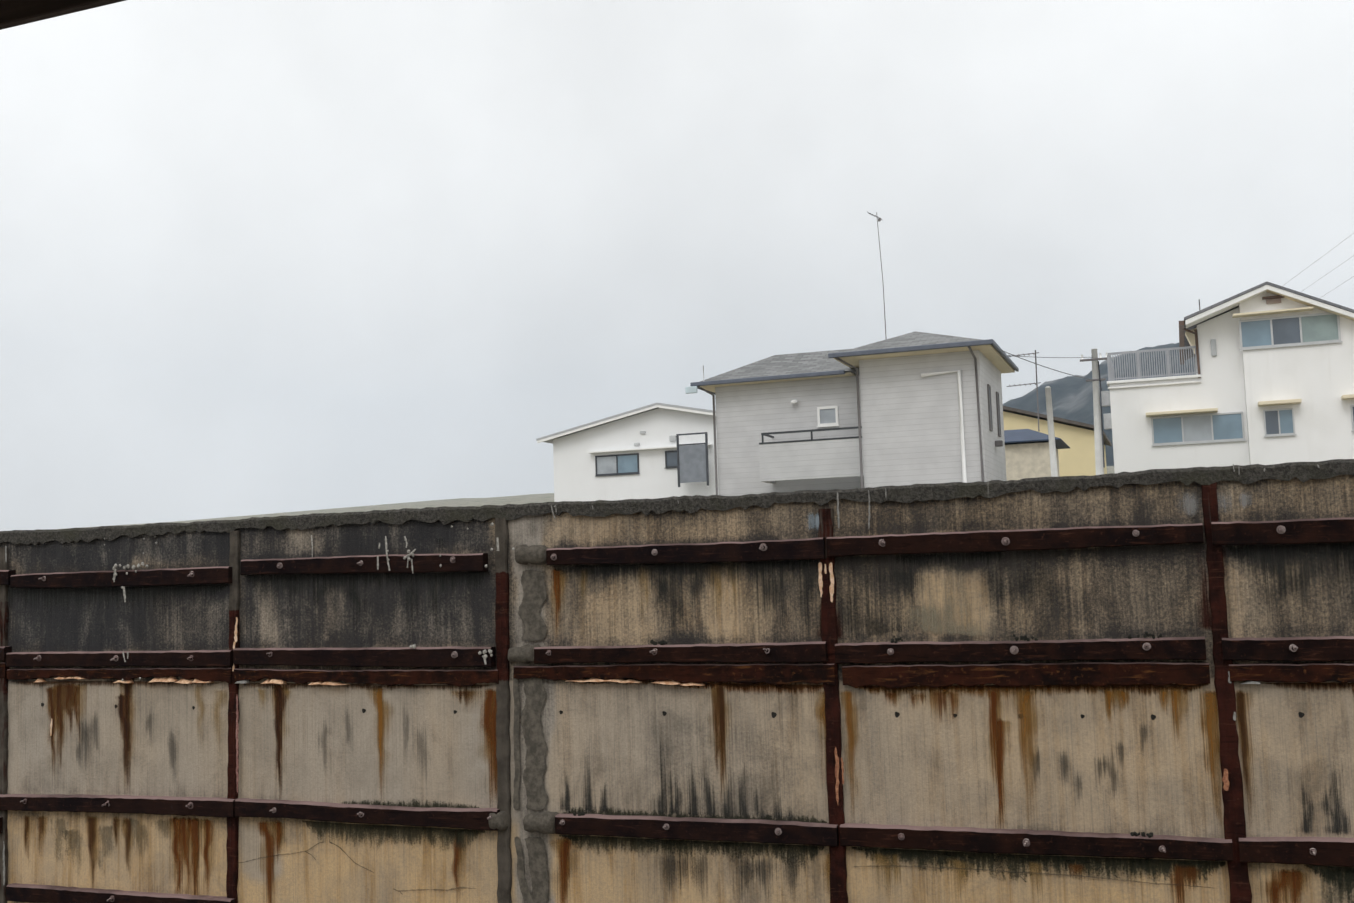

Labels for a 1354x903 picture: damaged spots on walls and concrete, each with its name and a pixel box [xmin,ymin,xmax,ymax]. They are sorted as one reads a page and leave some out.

leakage [8,535,228,609]
leakage [244,522,515,620]
leakage [550,560,815,624]
corrosion [12,681,222,779]
corrosion [239,683,497,786]
leakage [561,770,608,813]
corrosion [573,680,826,775]
leakage [654,748,793,820]
corrosion [842,684,1220,816]
leakage [1302,771,1350,834]
corrosion [88,817,97,878]
corrosion [170,817,213,894]